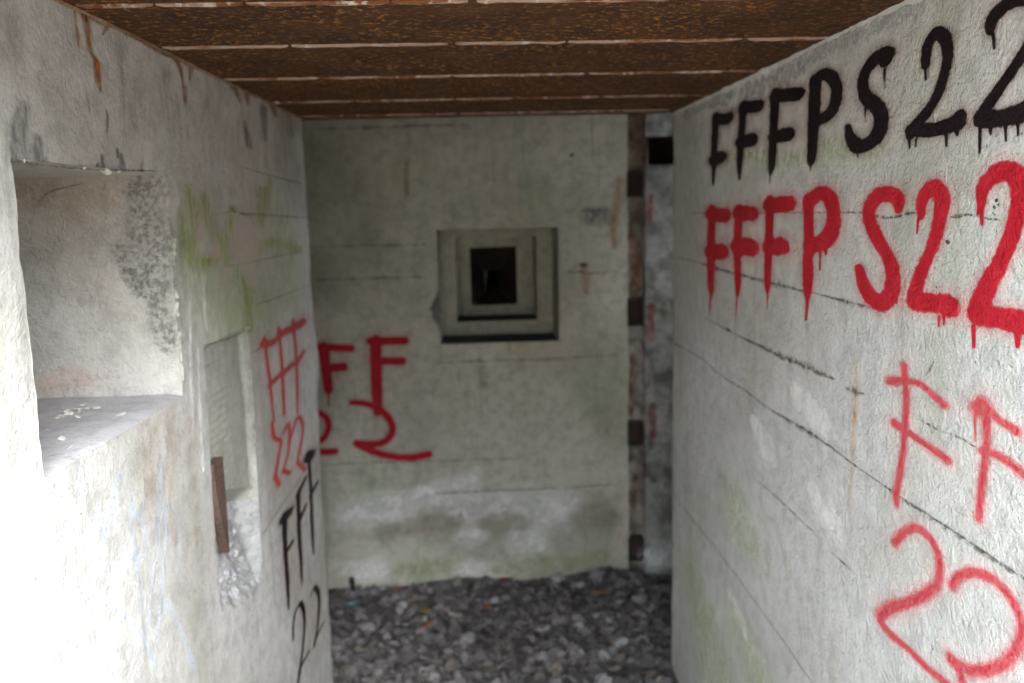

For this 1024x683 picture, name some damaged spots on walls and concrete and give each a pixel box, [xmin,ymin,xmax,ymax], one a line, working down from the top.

corrosion [81,13,108,92]
leakage [115,163,234,352]
spalling [215,500,264,658]